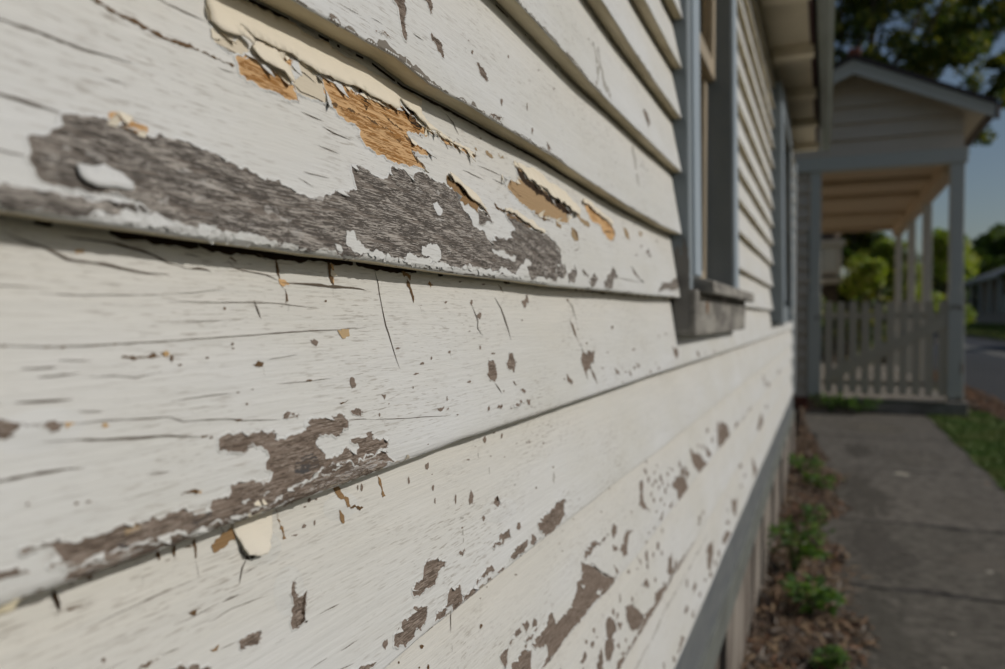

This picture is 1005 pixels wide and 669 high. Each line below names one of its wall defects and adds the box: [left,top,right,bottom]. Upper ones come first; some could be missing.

peeling [0,0,618,290]
crack [0,232,399,442]
peeling [497,387,530,409]
crack [0,468,84,482]
peeling [167,661,212,669]
peeling [0,407,396,584]
peeling [237,629,261,651]
peeling [289,579,307,632]
peeling [383,497,568,650]
peeling [499,404,767,669]